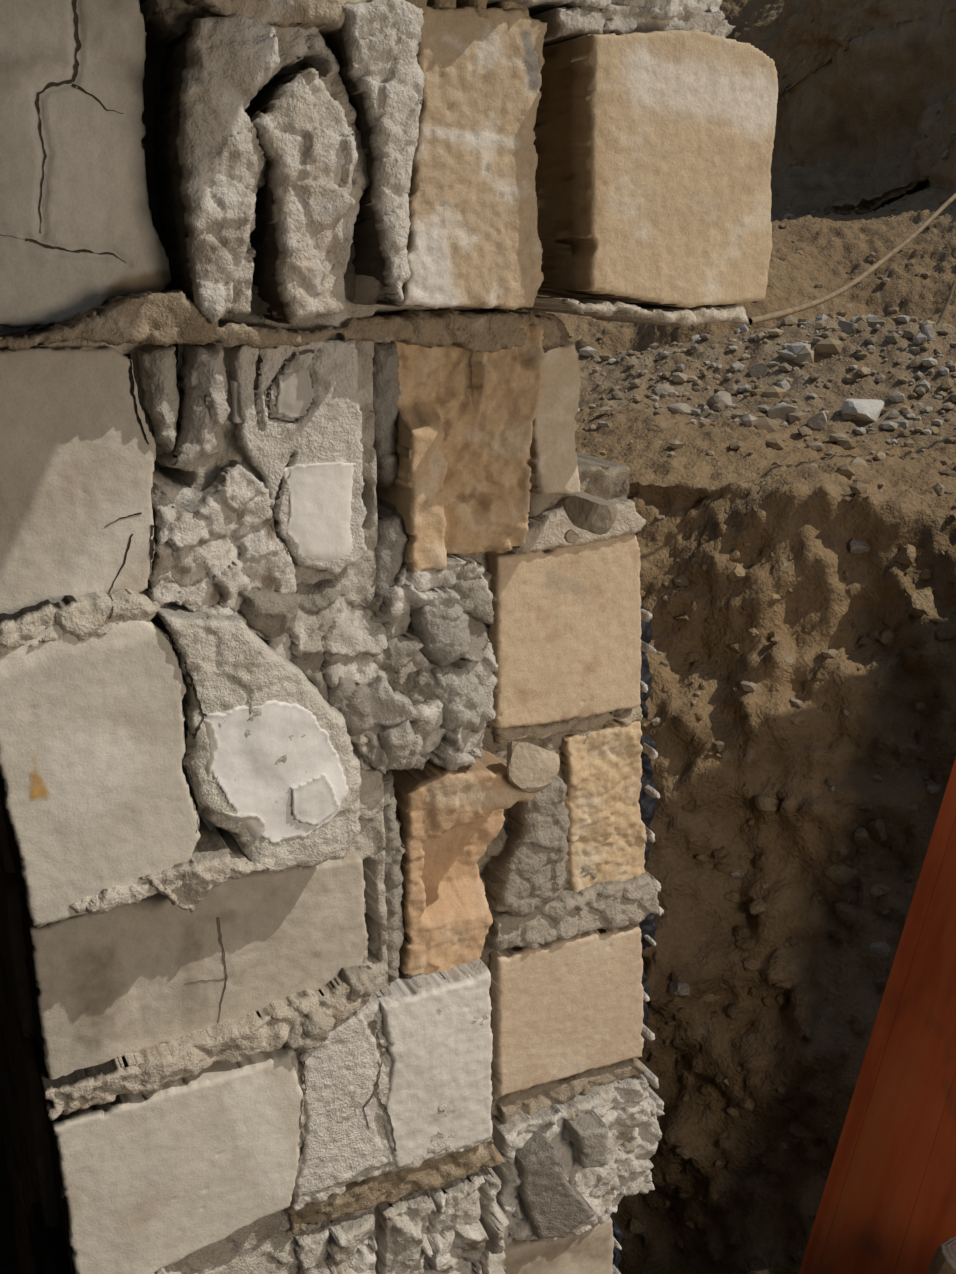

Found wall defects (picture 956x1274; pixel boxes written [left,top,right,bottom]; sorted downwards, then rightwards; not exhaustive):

spalling [487,0,722,21]
crack [0,0,126,263]
spalling [140,0,425,324]
spalling [136,343,250,469]
peeling [275,367,316,419]
spalling [146,460,498,776]
peeling [183,700,349,844]
crack [187,917,228,1023]